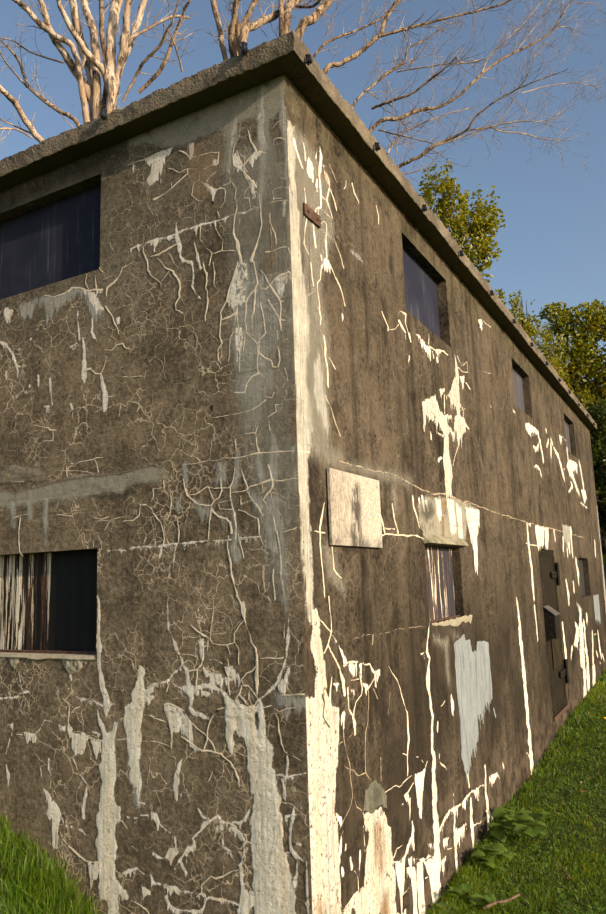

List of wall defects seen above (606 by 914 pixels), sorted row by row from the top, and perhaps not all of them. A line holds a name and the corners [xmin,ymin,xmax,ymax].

water stain [19,143,259,412]
crack [0,341,21,378]
water stain [27,497,48,545]
crack [147,536,297,720]
crack [316,502,454,835]
spalling [432,614,473,627]
water stain [72,758,88,819]
water stain [173,759,182,801]
crack [122,808,250,914]
water stain [222,698,278,914]
crack [275,756,306,888]
spalling [363,779,387,814]